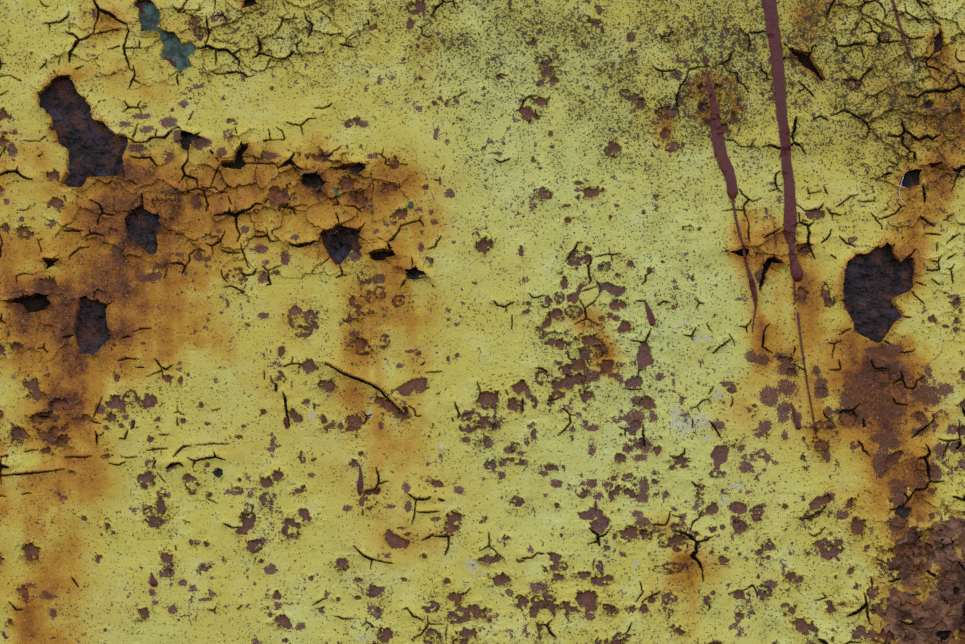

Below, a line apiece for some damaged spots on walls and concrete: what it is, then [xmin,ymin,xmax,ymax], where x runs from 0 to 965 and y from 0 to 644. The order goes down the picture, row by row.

spalling [25,65,128,209]
crack [0,0,192,166]
spalling [121,0,198,74]
crack [173,0,369,77]
crack [235,103,332,171]
crack [725,0,965,318]
crack [118,328,172,375]
rust [0,0,466,644]
crack [327,364,420,417]
crack [332,199,439,286]
rust [695,15,965,644]
spalling [823,230,927,343]